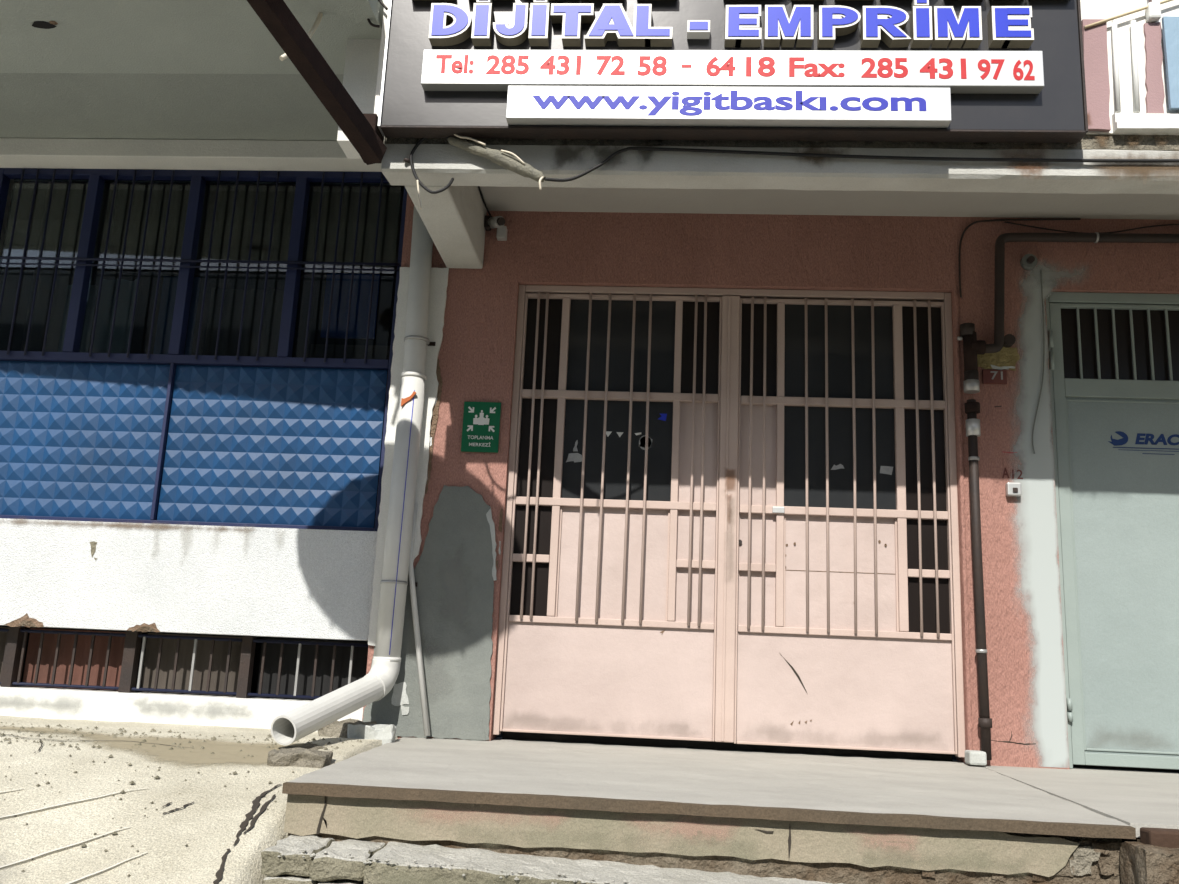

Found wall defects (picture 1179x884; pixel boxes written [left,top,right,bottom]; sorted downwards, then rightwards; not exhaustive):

leakage [1098,136,1179,174]
spalling [5,613,44,627]
crack [163,802,194,814]
crack [213,784,281,884]
crack [316,796,327,834]